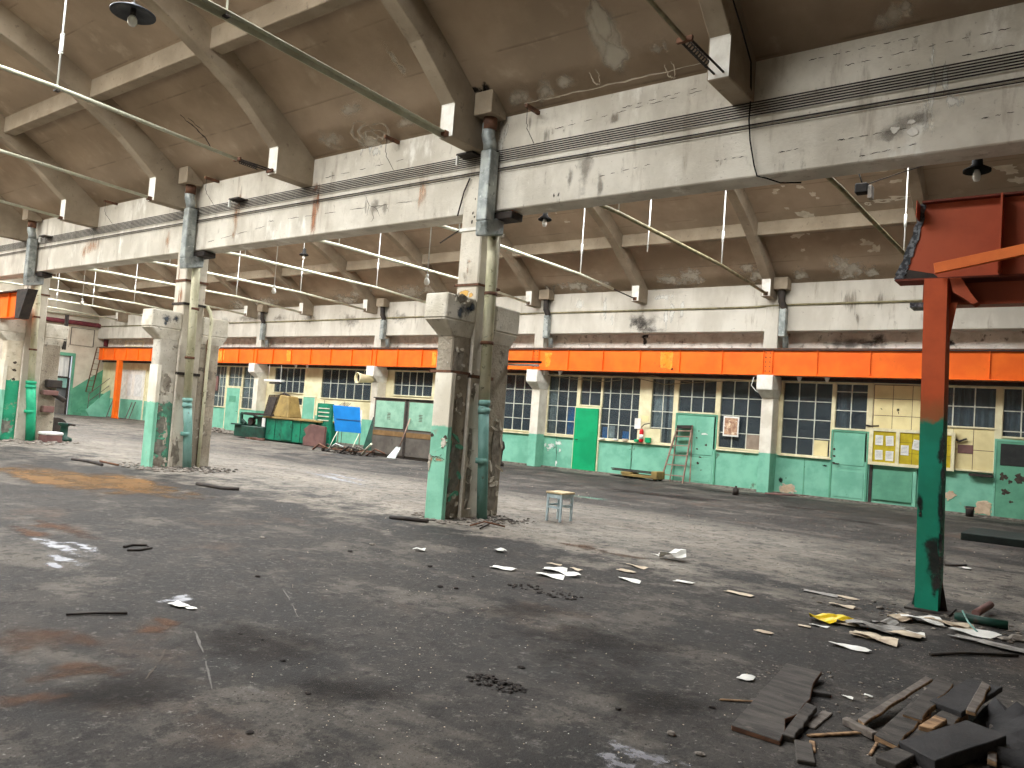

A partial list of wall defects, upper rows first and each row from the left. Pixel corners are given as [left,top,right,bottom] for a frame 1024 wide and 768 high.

spalling [152,373,183,467]
spalling [441,427,476,518]
peeling [1000,472,1024,503]